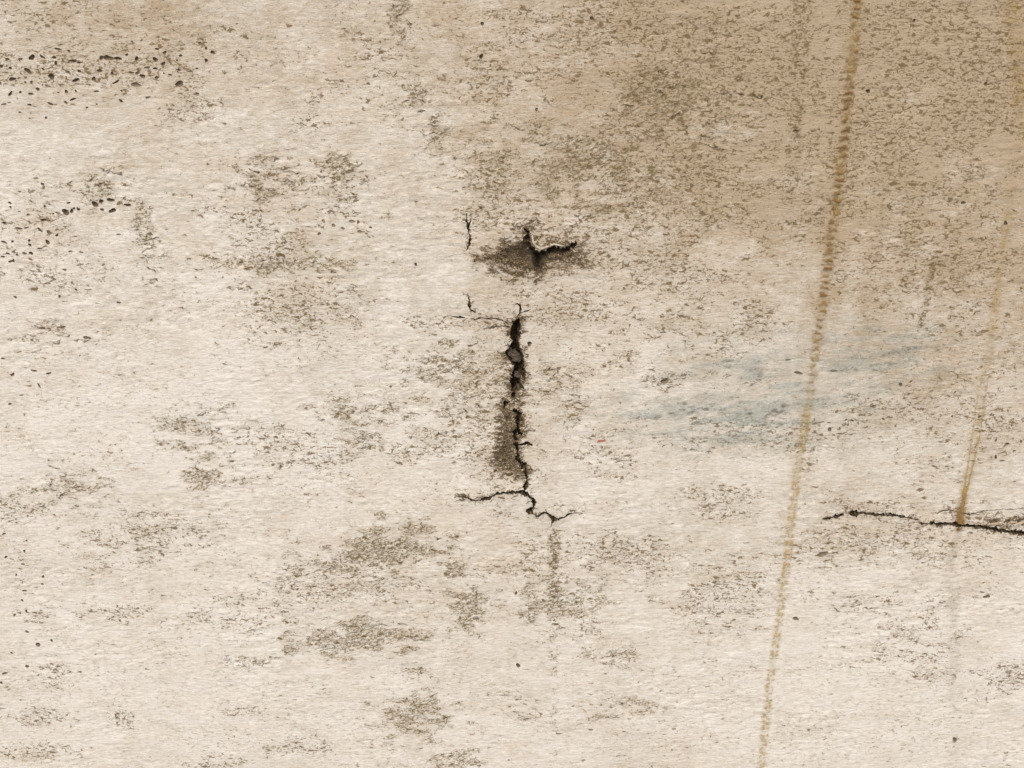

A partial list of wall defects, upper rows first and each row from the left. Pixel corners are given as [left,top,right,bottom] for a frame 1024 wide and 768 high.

rust [812,68,855,366]
crack [451,295,583,528]
crack [823,508,1024,537]
rust [957,435,980,531]